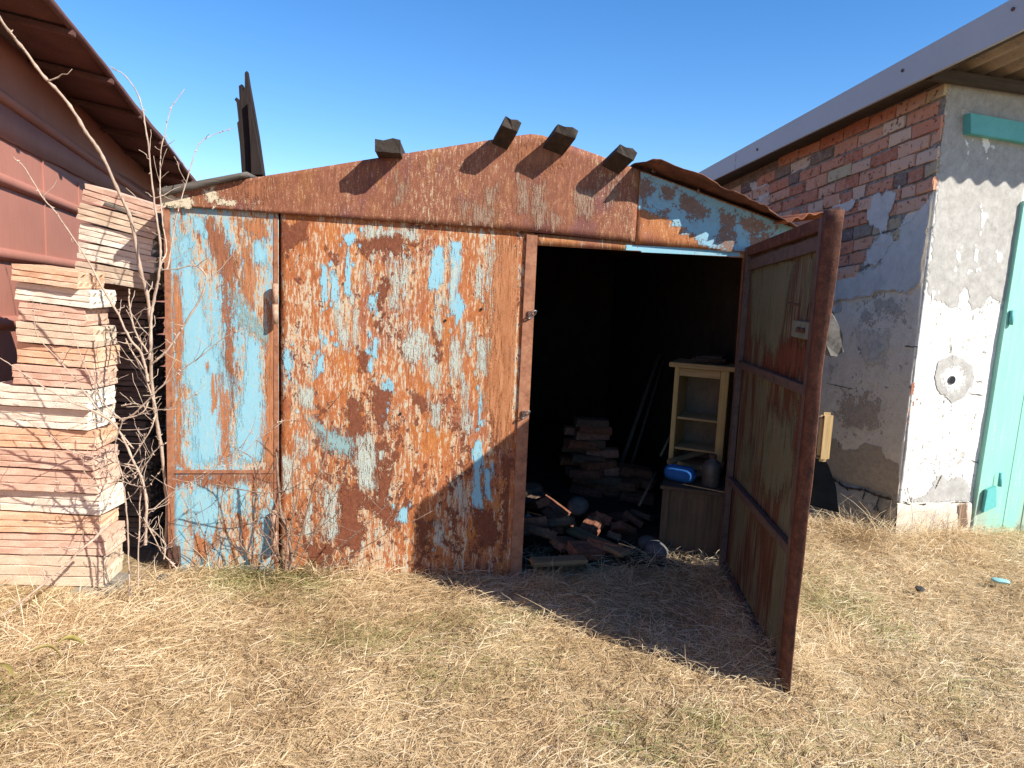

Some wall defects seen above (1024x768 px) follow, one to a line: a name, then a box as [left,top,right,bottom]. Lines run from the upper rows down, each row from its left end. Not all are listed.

corrosion [508,138,569,181]
flaking render [625,83,1024,320]
peeling [156,186,276,562]
corrosion [171,177,309,493]
corrosion [312,344,393,461]
corrosion [356,231,418,335]
corrosion [406,388,437,426]
corrosion [431,325,444,365]
corrosion [472,235,520,562]
corrosion [184,522,222,565]
corrosion [302,464,402,570]
corrosion [416,507,461,560]